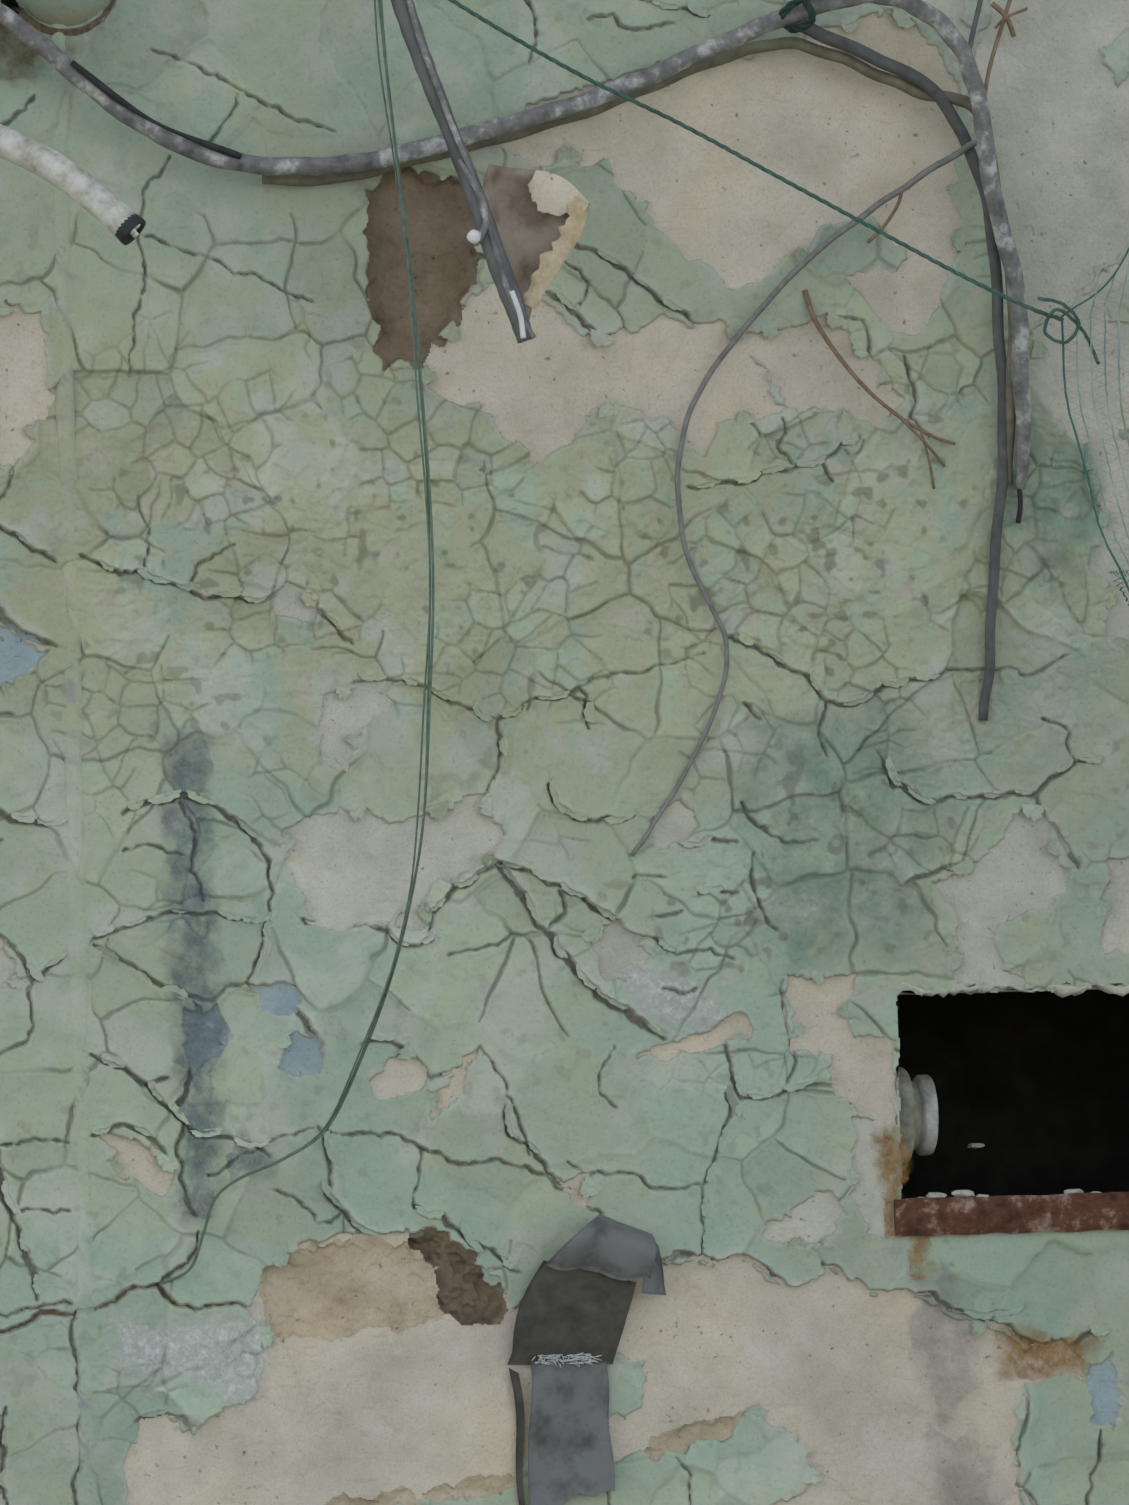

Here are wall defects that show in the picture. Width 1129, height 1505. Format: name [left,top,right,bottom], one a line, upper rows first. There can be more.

crack [556,242,689,331]
peeling [363,166,912,468]
peeling [496,0,1129,660]
crack [325,613,1063,788]
crack [0,789,308,1050]
crack [377,861,693,1040]
spalling [762,804,1129,1249]
crack [0,991,819,1391]
rust [877,1135,909,1236]
peeling [124,1227,532,1505]
peeling [609,1255,1122,1505]
rust [1008,1334,1084,1378]